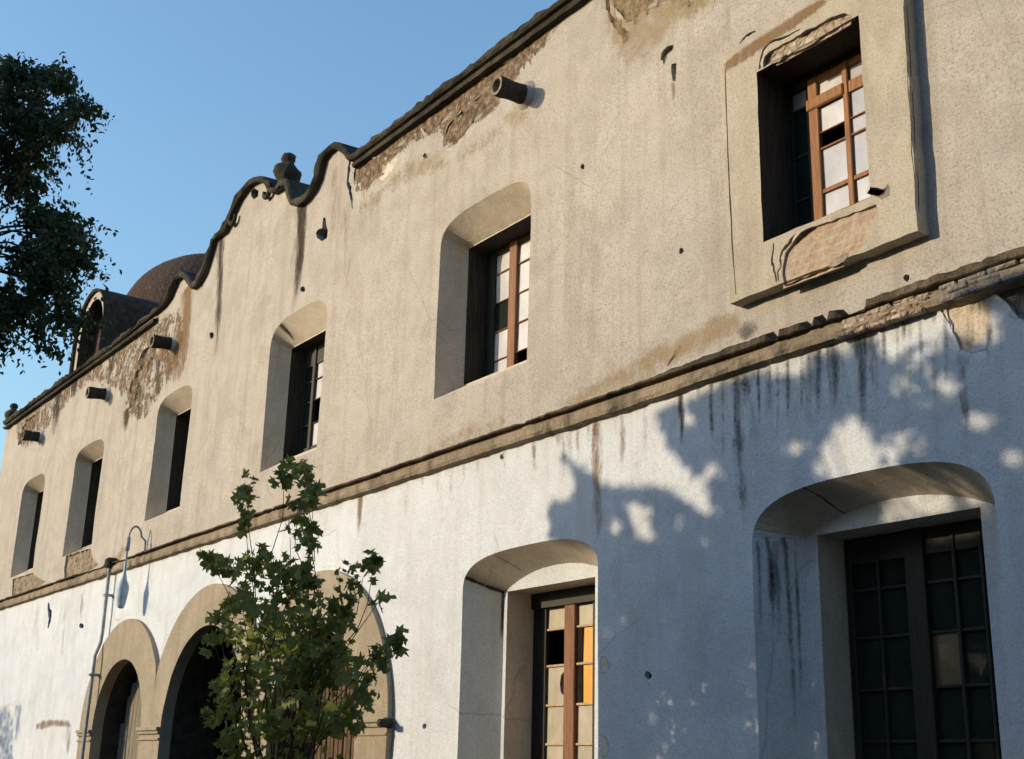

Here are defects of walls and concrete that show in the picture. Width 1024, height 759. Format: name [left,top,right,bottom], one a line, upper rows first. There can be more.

peeling [16,309,183,448]